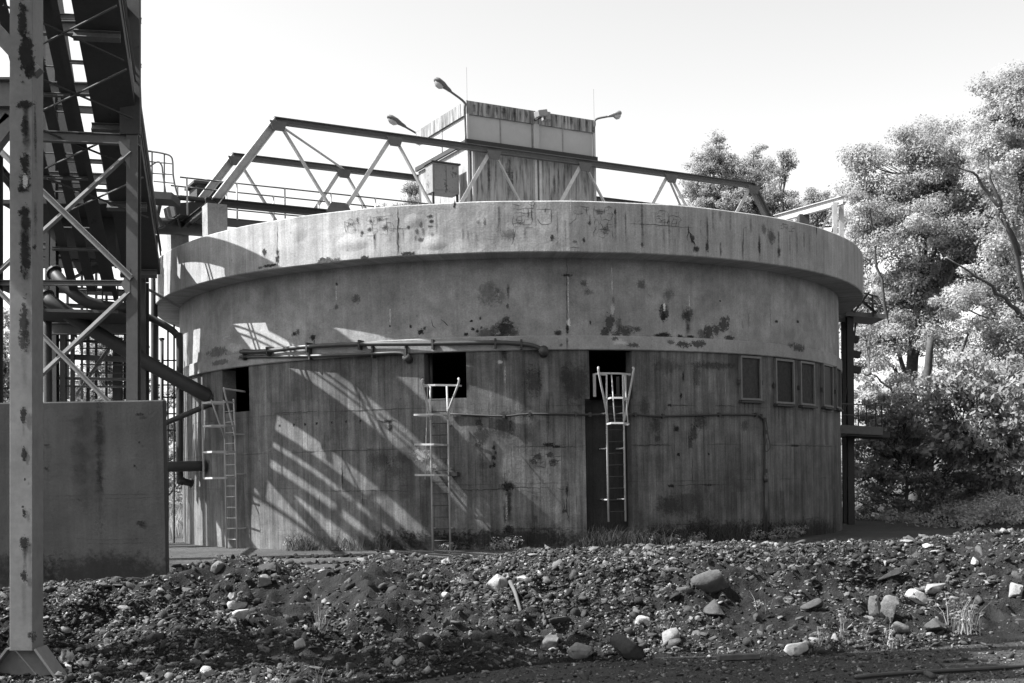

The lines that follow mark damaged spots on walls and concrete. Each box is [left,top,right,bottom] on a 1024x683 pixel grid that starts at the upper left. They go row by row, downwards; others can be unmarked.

rust [17,0,36,83]
rust [16,100,37,149]
rust [18,202,37,280]
rust [18,298,30,352]
leakage [616,325,640,336]
leakage [654,296,694,338]